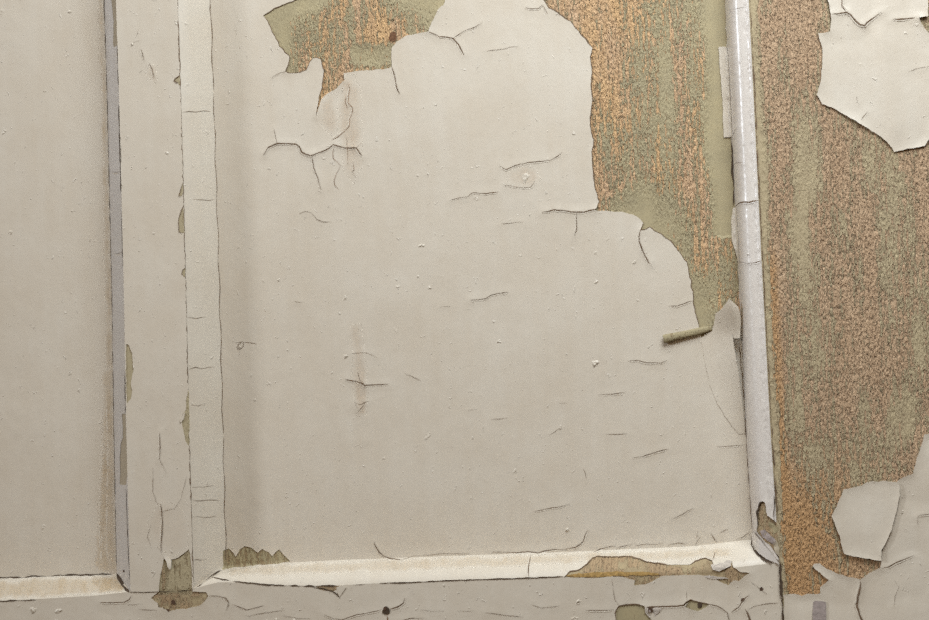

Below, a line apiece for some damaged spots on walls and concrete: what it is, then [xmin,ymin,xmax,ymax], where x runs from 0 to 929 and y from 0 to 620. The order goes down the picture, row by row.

peeling [263,0,445,115]
crack [429,23,483,55]
crack [264,85,362,190]
crack [451,153,563,202]
crack [543,209,597,236]
peeling [544,0,745,434]
peeling [749,0,929,620]
peeling [152,550,208,612]
peeling [222,546,290,570]
crack [219,596,428,620]
peeling [565,556,749,585]
crack [649,584,771,620]